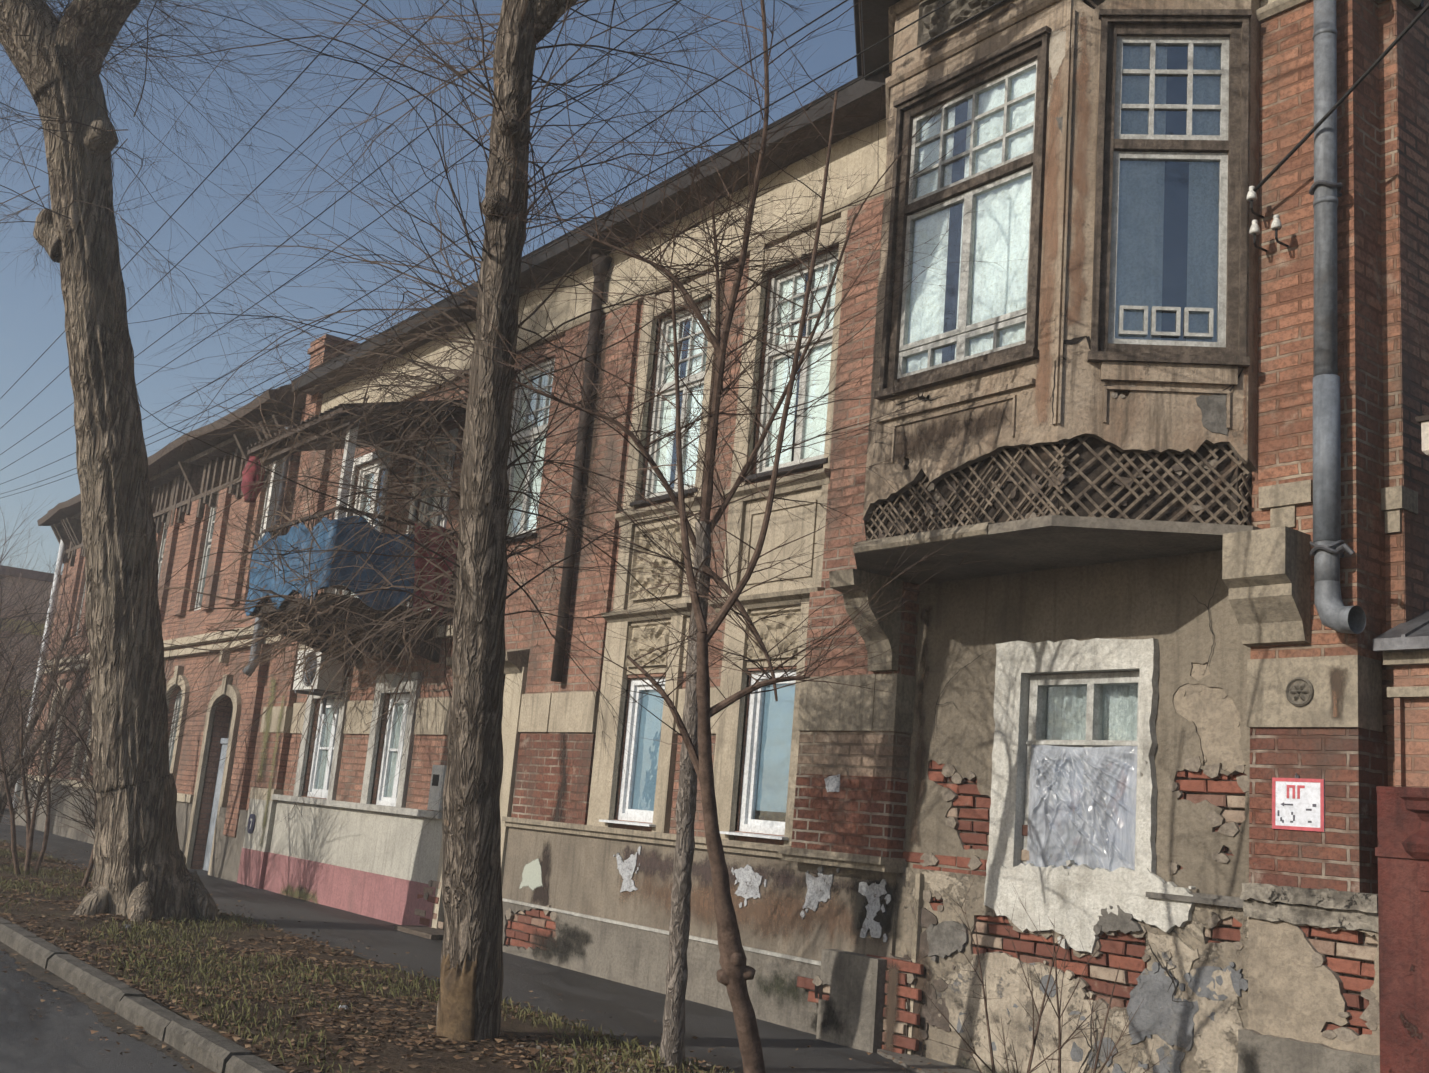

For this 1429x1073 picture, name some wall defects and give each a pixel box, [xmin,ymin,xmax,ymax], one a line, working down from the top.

spalling [902,760,991,876]
spalling [1168,663,1250,863]
spalling [505,905,558,949]
spalling [867,890,1248,1057]
spalling [1299,925,1380,1042]